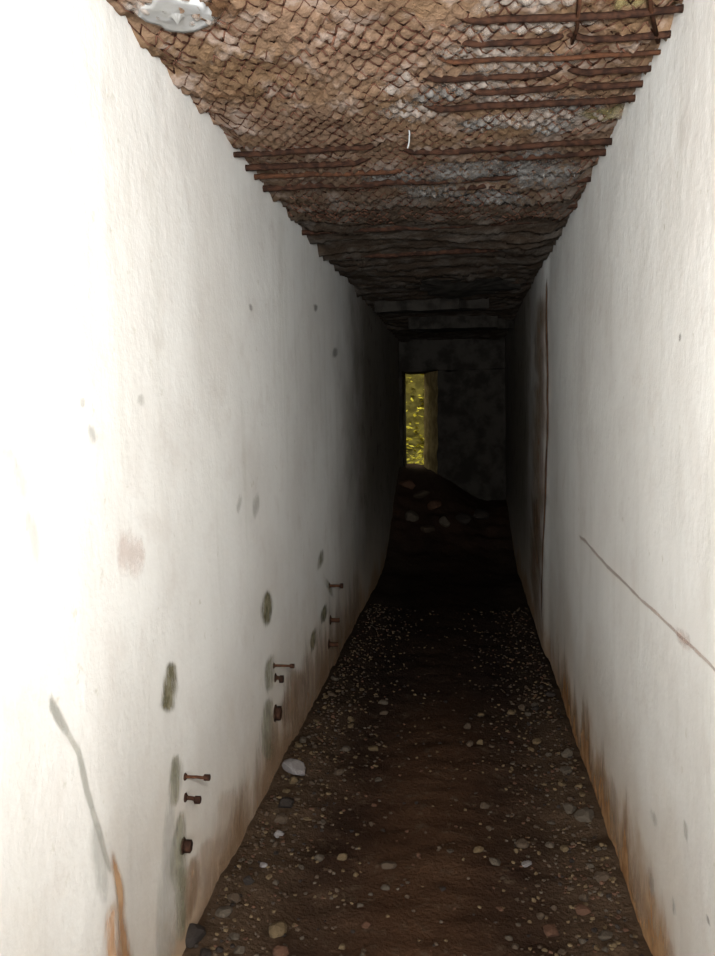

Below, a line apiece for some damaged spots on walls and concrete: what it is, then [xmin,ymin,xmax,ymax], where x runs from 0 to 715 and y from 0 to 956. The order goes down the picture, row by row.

peeling [124,0,217,34]
spalling [480,0,576,11]
spalling [383,20,625,137]
spalling [363,150,579,206]
rust [531,282,549,609]
leakage [171,760,179,803]
rust [559,673,668,956]
leakage [171,815,196,934]